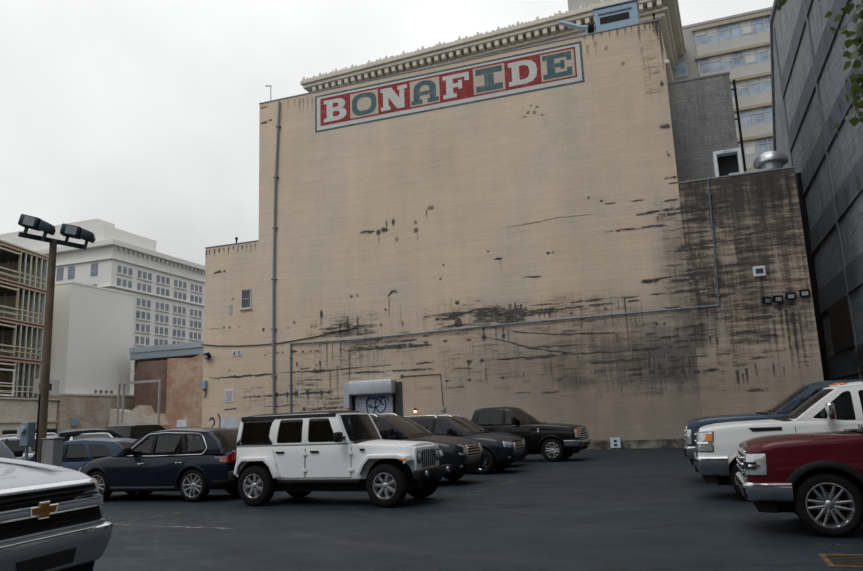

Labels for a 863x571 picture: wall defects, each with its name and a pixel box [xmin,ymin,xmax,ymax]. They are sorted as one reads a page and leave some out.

leakage [774,302,803,359]